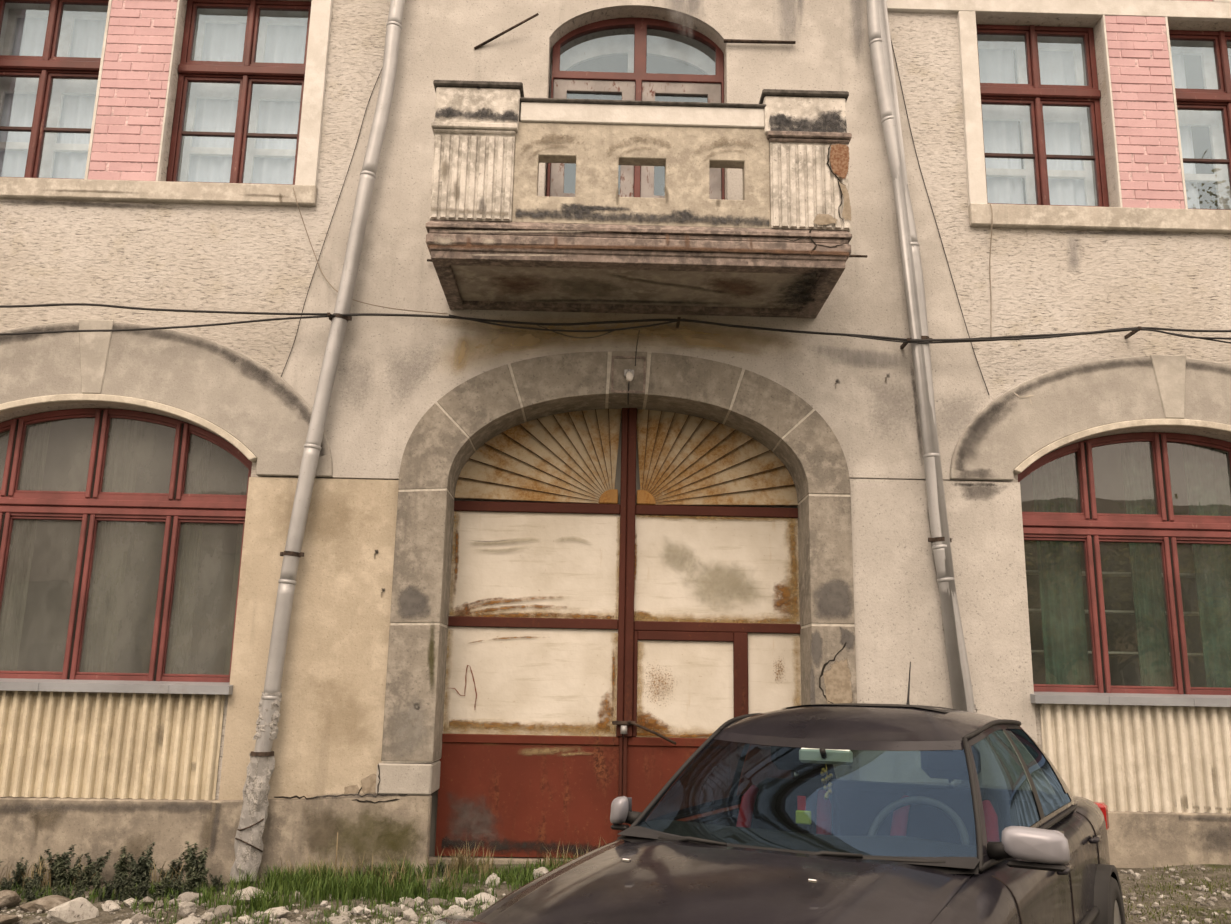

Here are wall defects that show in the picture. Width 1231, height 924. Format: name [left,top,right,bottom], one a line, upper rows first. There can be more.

water stain [435,107,519,122]
water stain [769,111,847,133]
spalling [814,144,851,225]
crack [274,764,408,803]